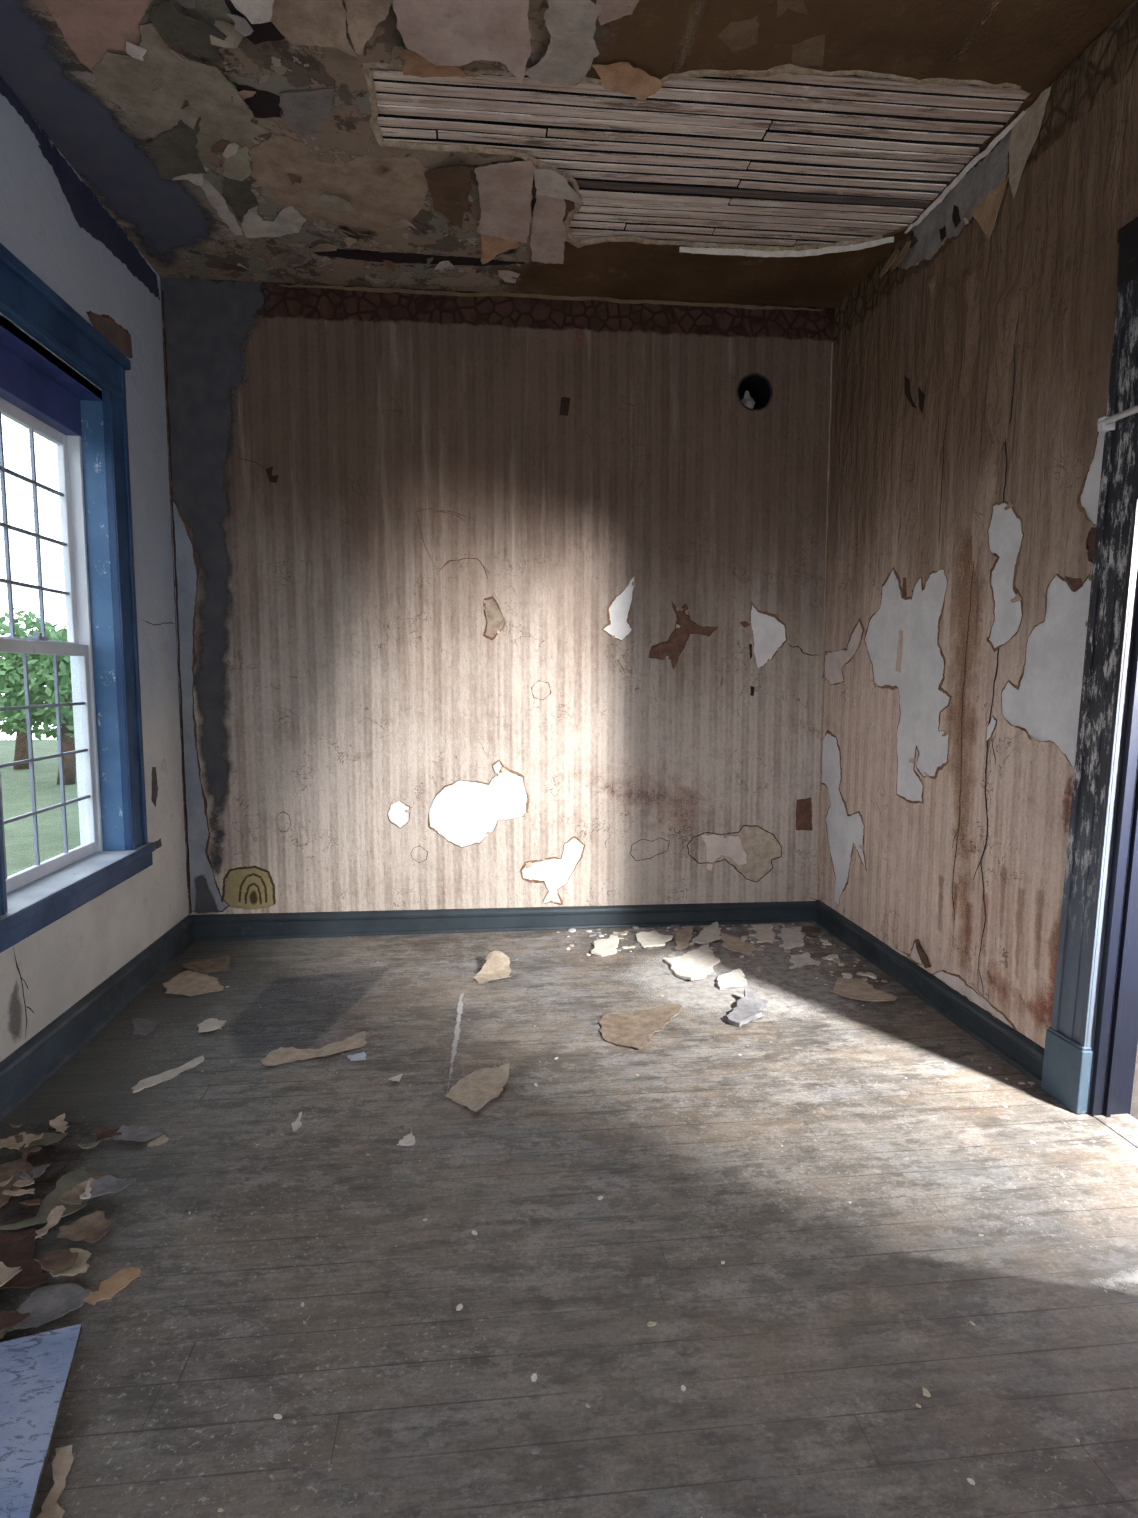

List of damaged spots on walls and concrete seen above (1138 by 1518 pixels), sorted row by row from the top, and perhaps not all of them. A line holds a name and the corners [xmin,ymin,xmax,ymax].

peeling [43,0,1051,278]
peeling [476,252,522,283]
peeling [161,311,230,912]
peeling [602,577,636,641]
peeling [750,601,787,669]
peeling [986,501,1092,768]
peeling [821,567,952,804]
peeling [387,800,410,829]
peeling [428,759,530,848]
peeling [520,836,585,905]
peeling [687,825,782,883]
peeling [820,730,867,906]